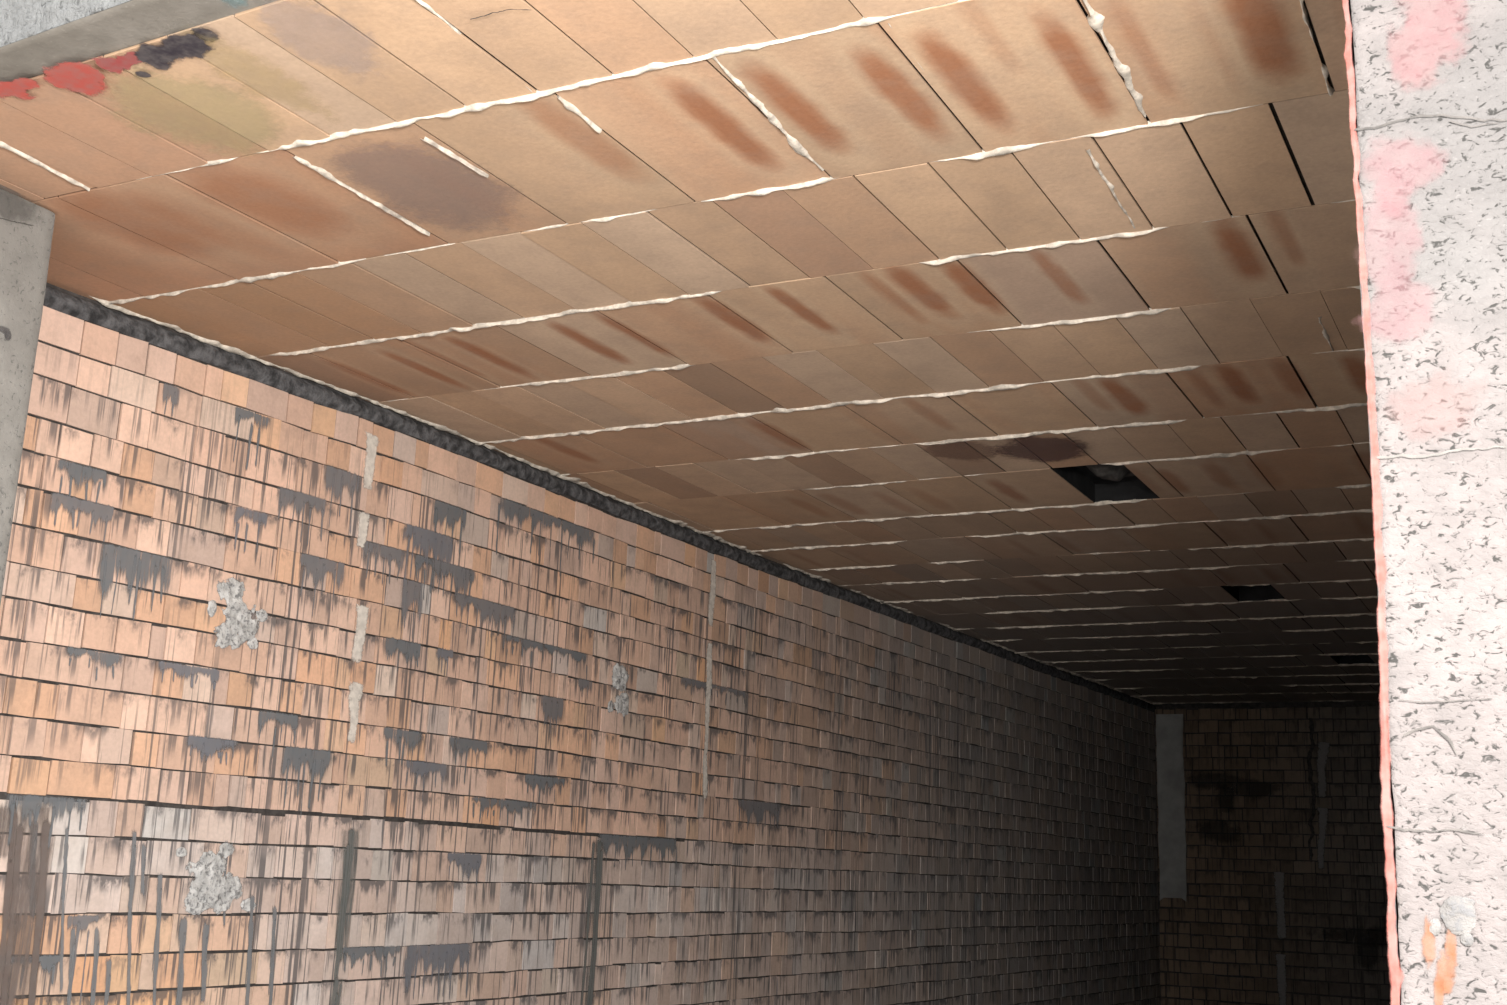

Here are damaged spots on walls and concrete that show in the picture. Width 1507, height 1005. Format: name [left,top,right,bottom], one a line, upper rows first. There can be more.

peeling [192,28,219,42]
water stain [357,512,370,547]
spalling [207,577,268,650]
water stain [352,604,369,662]
water stain [348,682,363,743]
water stain [702,560,716,798]
water stain [0,809,23,1005]
water stain [28,820,51,1005]
spalling [176,843,257,915]
water stain [334,830,353,1005]
water stain [580,841,603,1005]
rust [1423,921,1456,1005]